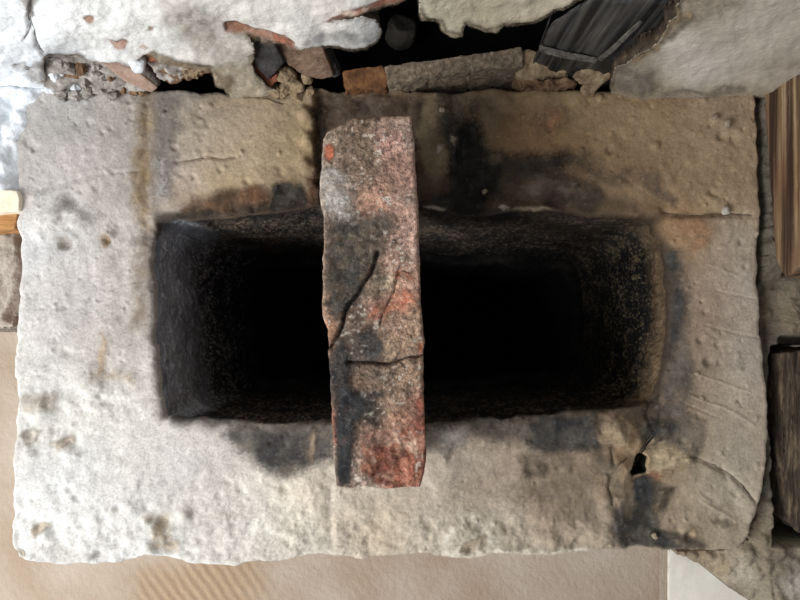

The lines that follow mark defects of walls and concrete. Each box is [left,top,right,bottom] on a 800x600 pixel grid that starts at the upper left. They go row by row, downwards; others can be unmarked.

peeling [224,21,303,52]
peeling [327,0,402,22]
spalling [419,9,513,37]
spalling [13,55,83,84]
spalling [137,46,271,99]
spalling [573,66,619,98]
crack [329,258,378,348]
crack [608,424,666,503]